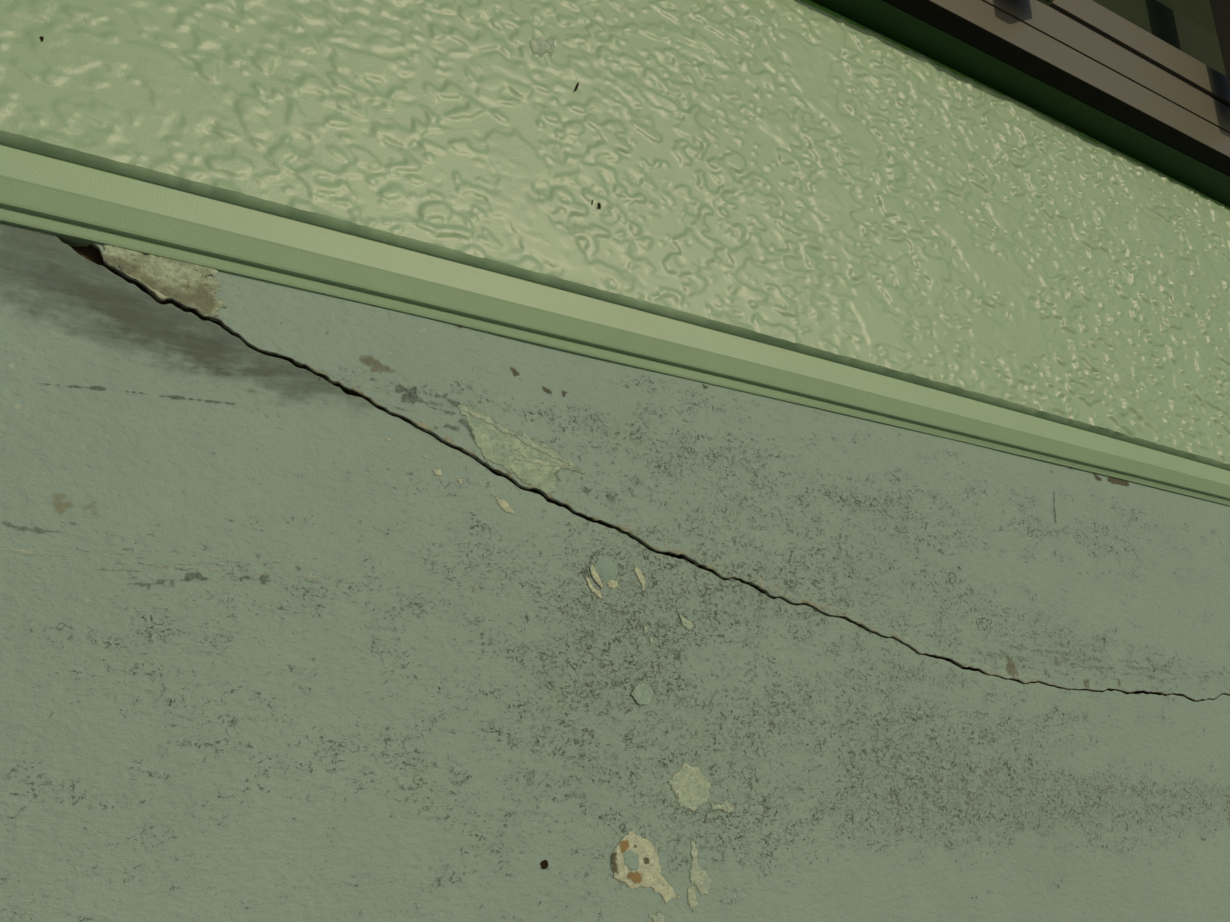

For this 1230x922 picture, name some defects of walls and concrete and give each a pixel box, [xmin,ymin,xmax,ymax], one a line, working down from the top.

leakage [0,231,241,355]
spalling [102,245,227,317]
peeling [458,405,585,493]
crack [69,242,1230,702]
peeling [668,763,734,813]
peeling [611,830,712,922]